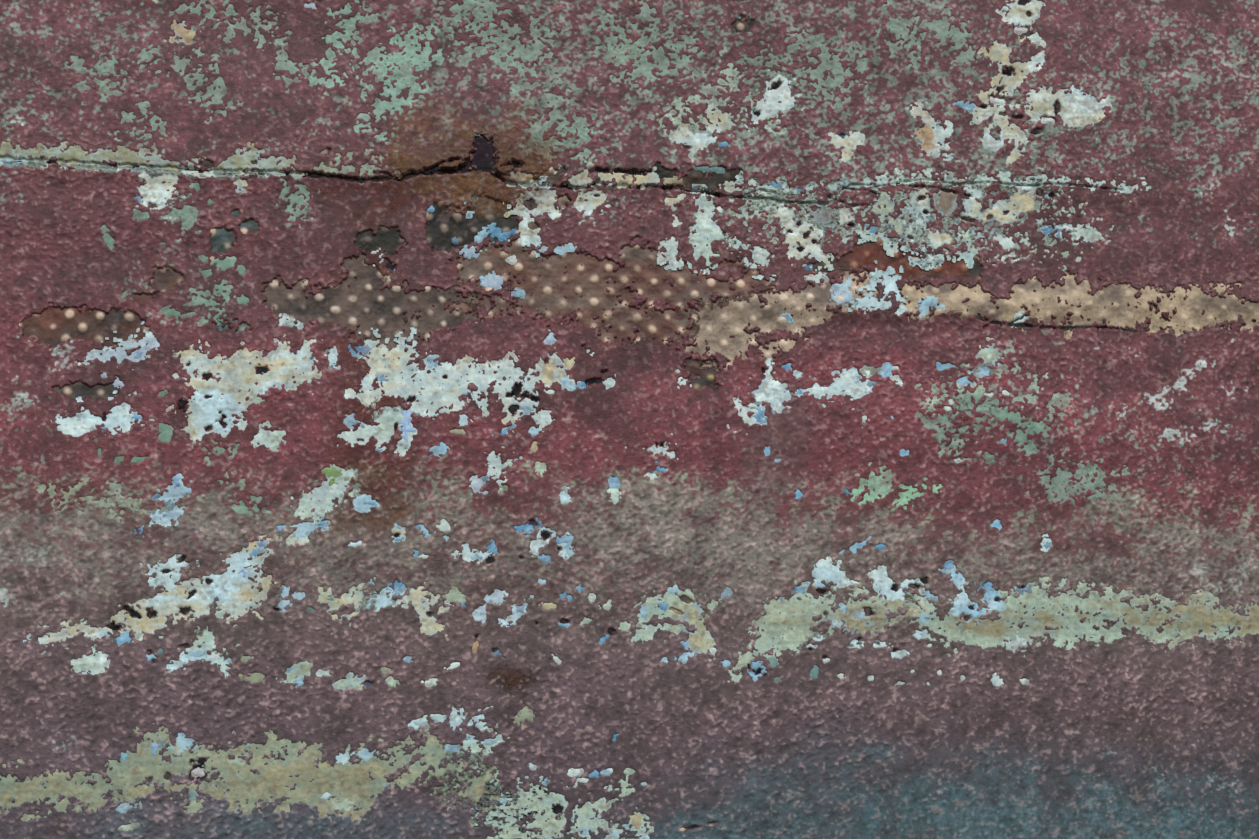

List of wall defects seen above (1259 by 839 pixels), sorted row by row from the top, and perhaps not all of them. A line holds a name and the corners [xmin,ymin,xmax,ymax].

crack [249,153,522,184]
corrosion [411,132,551,211]
crack [560,168,776,199]
crack [834,183,954,207]
spalling [0,0,1259,537]
peeling [23,458,614,693]
peeling [599,534,1259,682]
peeling [991,673,1004,687]
peeling [0,705,654,839]